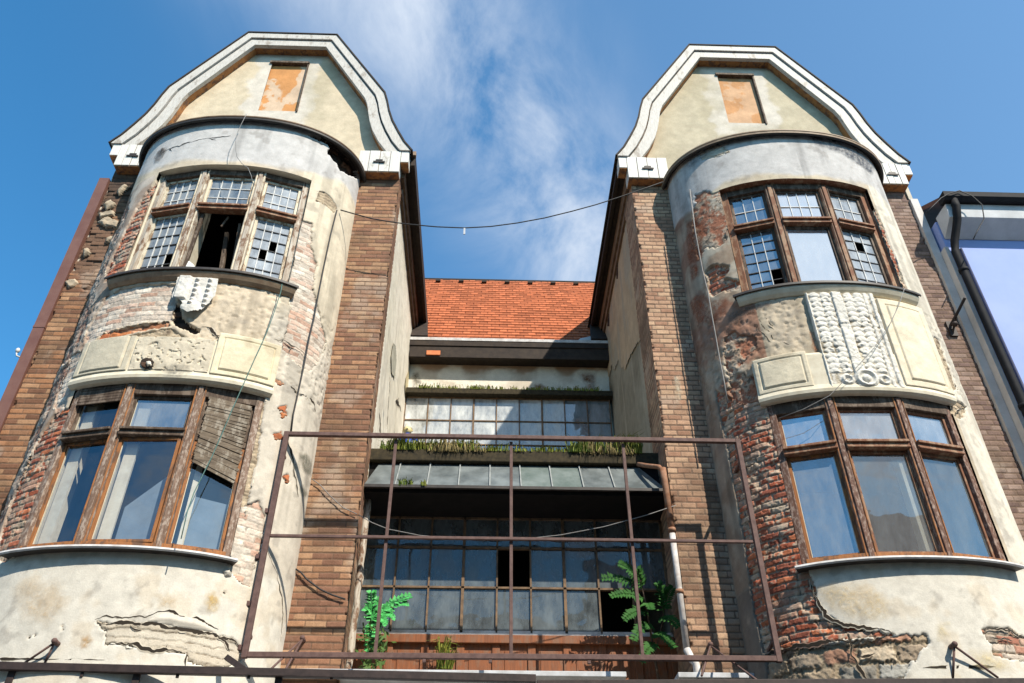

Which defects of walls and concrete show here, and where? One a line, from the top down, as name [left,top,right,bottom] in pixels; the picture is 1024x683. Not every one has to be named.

crack [167,136,228,151]
spalling [693,191,728,257]
spalling [706,265,741,296]
spalling [0,181,200,563]
spalling [717,332,929,679]
spalling [97,621,241,667]
spalling [981,627,1024,661]